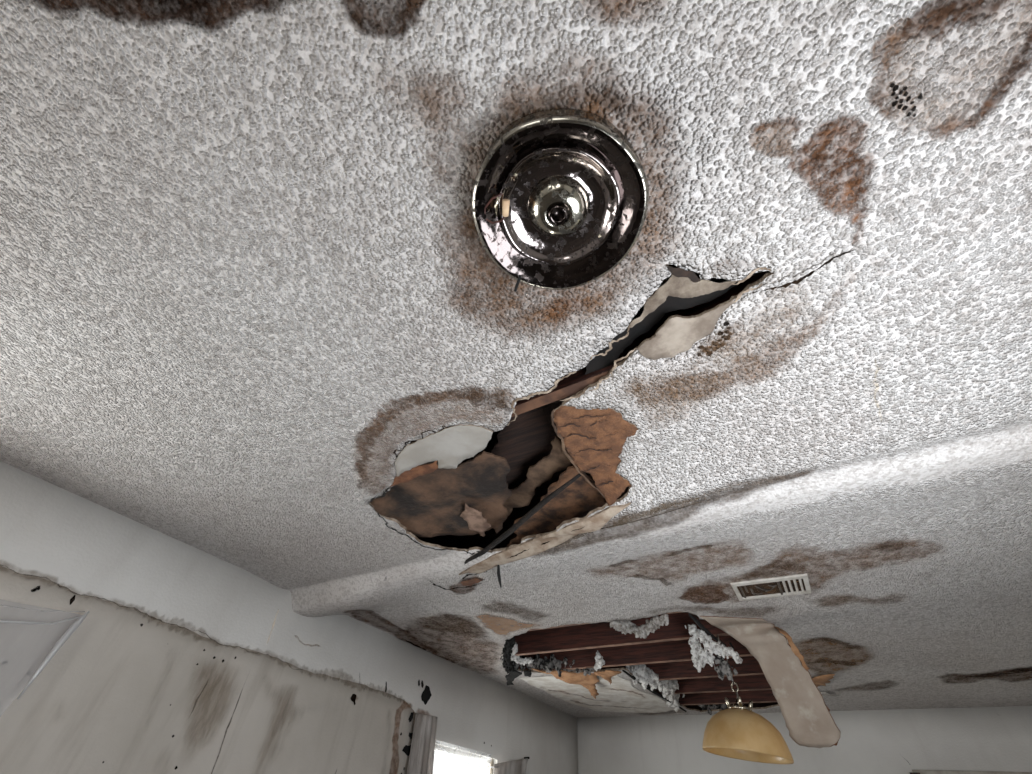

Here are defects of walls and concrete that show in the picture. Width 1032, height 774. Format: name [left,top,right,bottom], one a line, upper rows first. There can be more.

leakage [36,0,284,29]
leakage [343,0,426,36]
leakage [872,83,923,117]
leakage [873,0,1002,68]
leakage [972,31,1032,127]
leakage [453,90,666,328]
leakage [757,117,872,239]
crack [585,250,854,391]
spalling [370,371,638,594]
leakage [595,542,937,615]
peeling [0,565,432,774]
peeling [519,675,679,713]